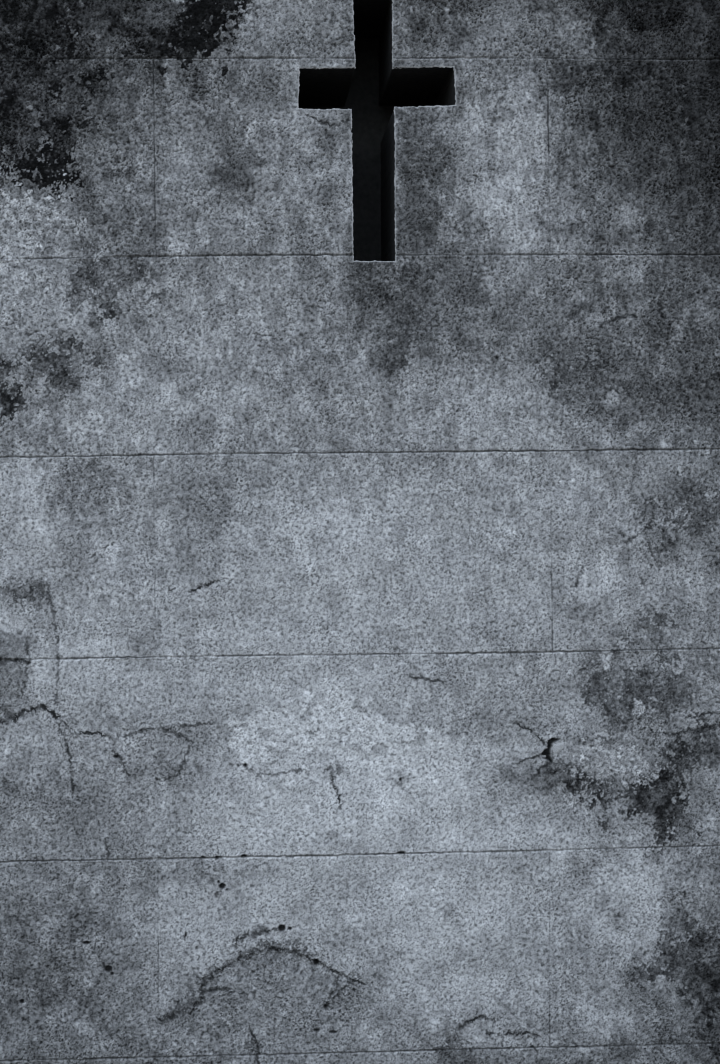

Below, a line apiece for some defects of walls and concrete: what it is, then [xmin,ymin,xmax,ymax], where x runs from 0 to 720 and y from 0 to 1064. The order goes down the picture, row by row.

crack [169,579,219,593]
crack [0,585,219,794]
spalling [514,722,564,776]